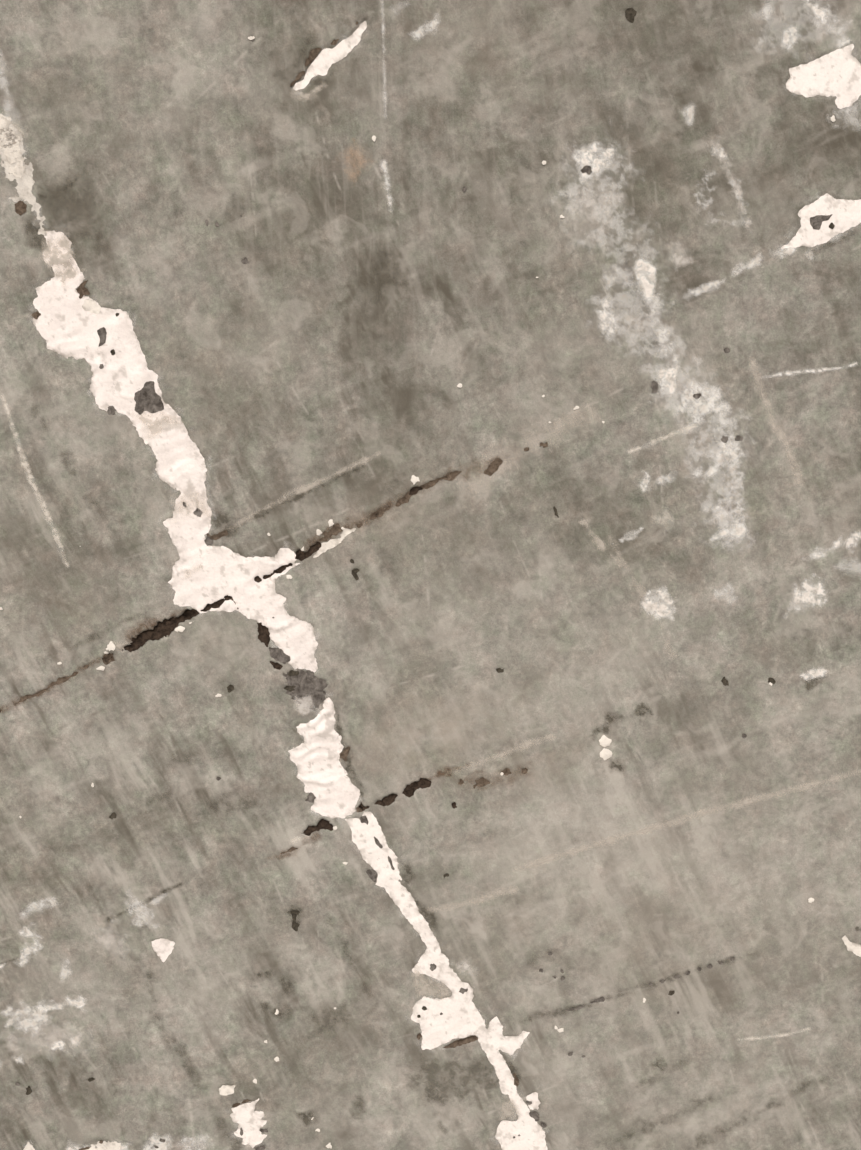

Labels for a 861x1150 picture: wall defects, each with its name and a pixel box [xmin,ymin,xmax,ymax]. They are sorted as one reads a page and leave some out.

peeling [290,21,367,99]
peeling [786,41,861,122]
peeling [781,193,861,256]
crack [254,442,548,583]
crack [0,595,239,712]
peeling [0,114,548,1150]